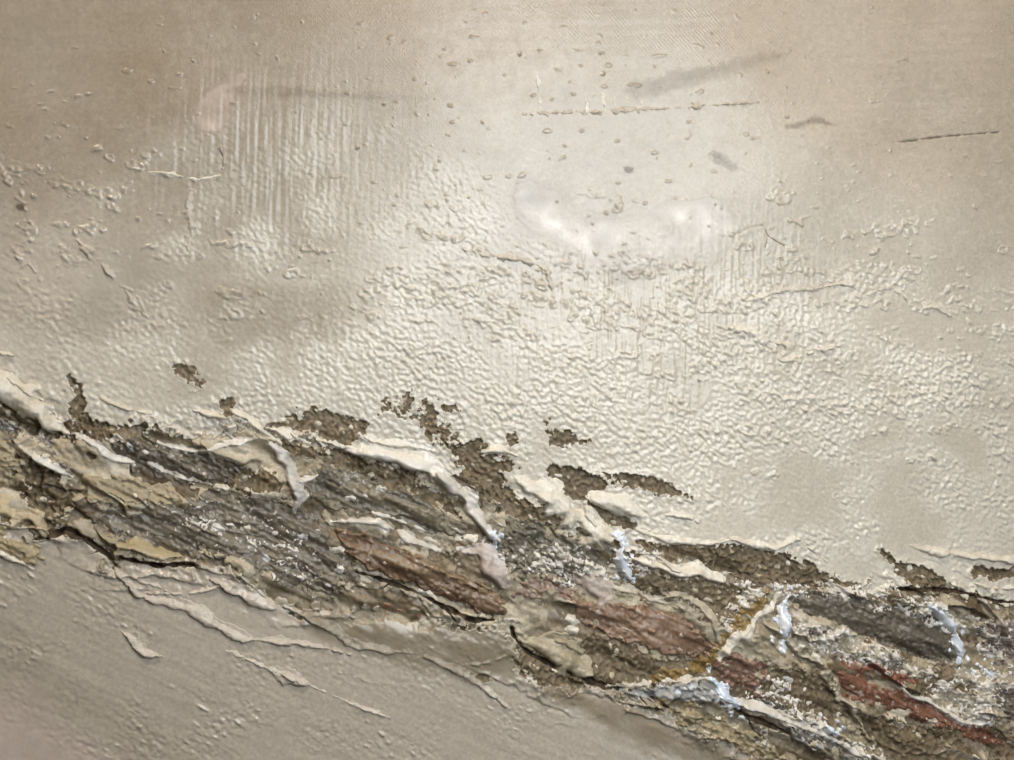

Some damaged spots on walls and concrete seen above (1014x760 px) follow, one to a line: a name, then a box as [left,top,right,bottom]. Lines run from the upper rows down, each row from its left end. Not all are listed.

crack [900,131,999,143]
peeling [167,363,206,389]
spalling [0,373,1014,760]
rust [334,528,772,697]
rust [838,658,1003,746]